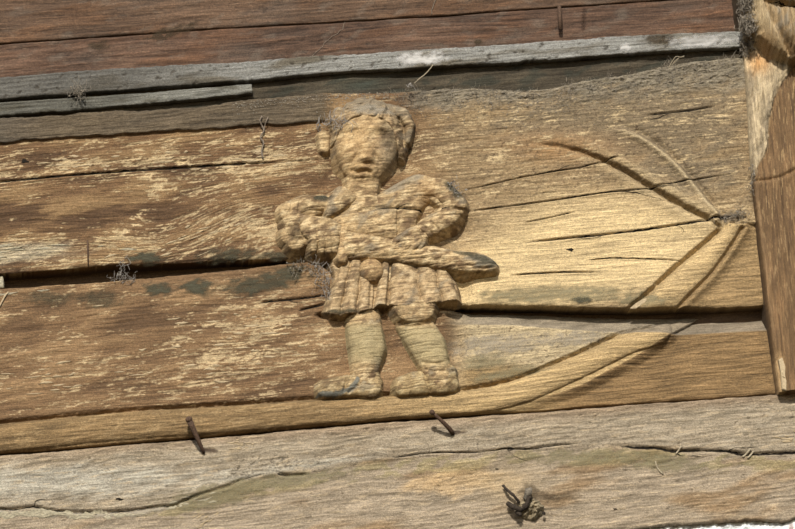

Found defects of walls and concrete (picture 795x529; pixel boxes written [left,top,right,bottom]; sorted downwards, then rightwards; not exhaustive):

crack [473,155,627,189]
crack [469,175,722,222]
crack [526,215,735,243]
crack [510,257,682,276]
crack [622,446,795,457]